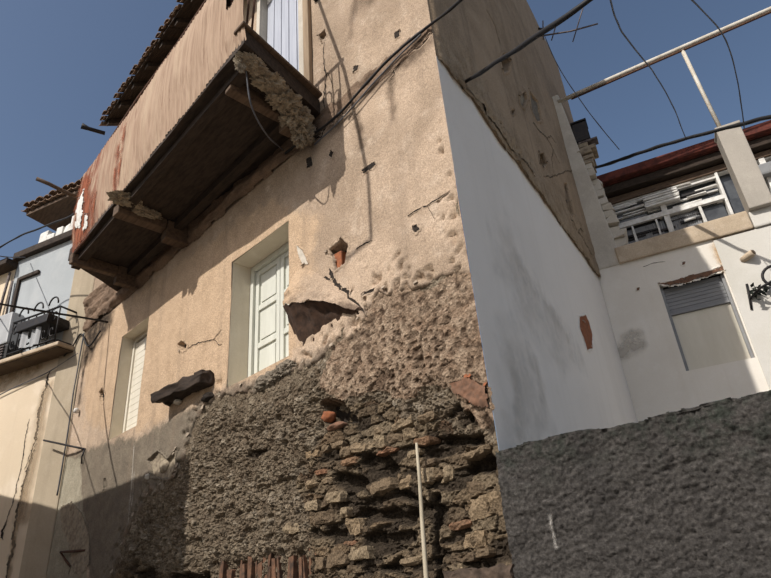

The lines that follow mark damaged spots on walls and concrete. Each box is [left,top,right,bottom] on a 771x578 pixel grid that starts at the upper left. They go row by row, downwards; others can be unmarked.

spalling [233,51,317,170]
crack [314,41,361,143]
rust [73,176,96,246]
crack [408,190,450,219]
peeling [296,244,310,267]
flaking render [324,236,351,273]
spalling [658,260,724,287]
crack [187,330,222,350]
peeling [578,313,593,353]
flaking render [110,254,512,578]
crack [0,371,51,578]